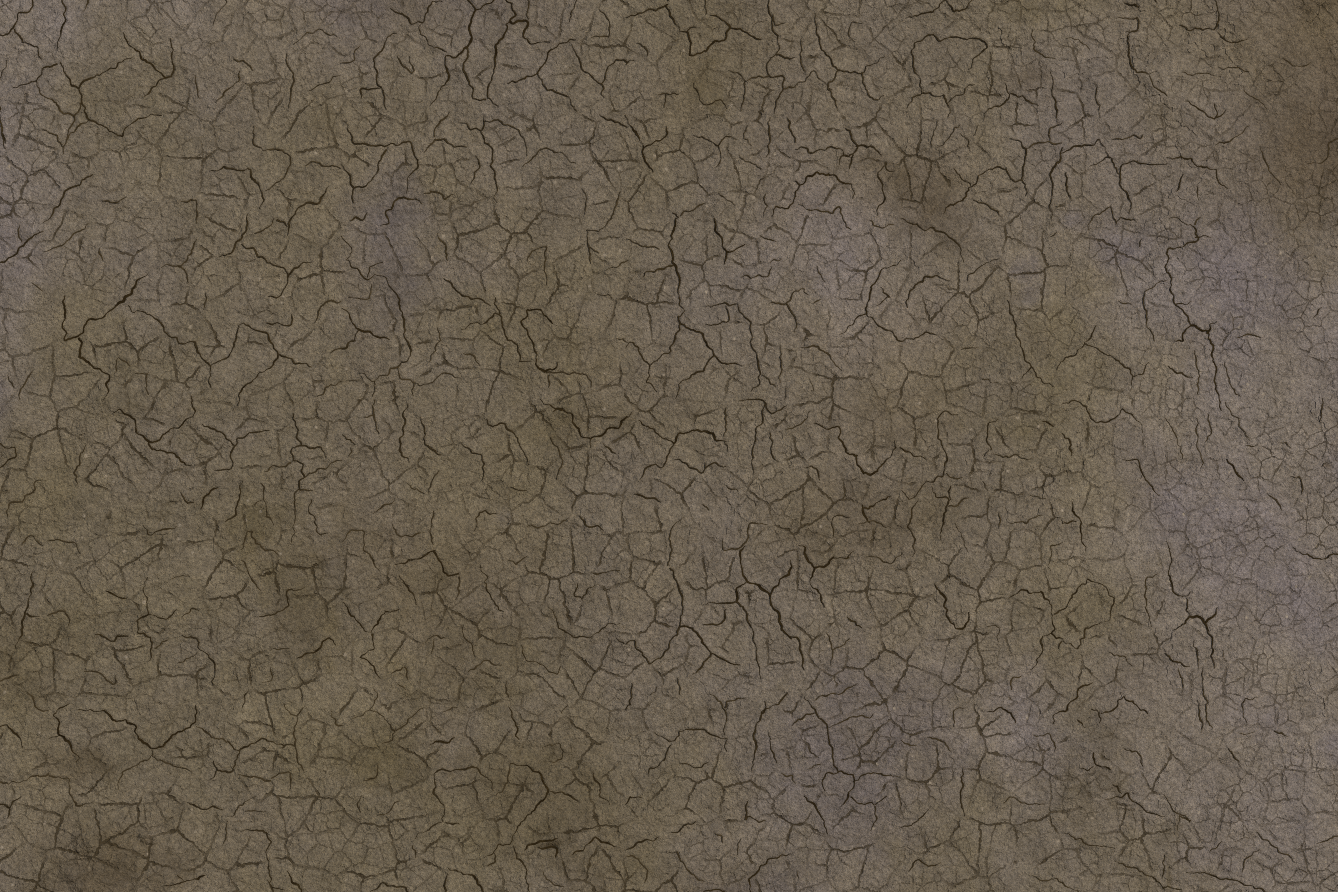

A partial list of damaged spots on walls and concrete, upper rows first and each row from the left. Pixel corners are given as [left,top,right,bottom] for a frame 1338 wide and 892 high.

crack [31,0,1291,744]
crack [0,443,17,468]
crack [1267,462,1327,510]
crack [6,479,81,554]
crack [1293,547,1338,560]
crack [901,495,1191,831]
crack [0,572,336,892]
crack [357,766,399,816]
crack [370,882,408,892]
crack [908,859,941,872]
crack [1032,875,1079,892]
crack [1064,832,1338,892]